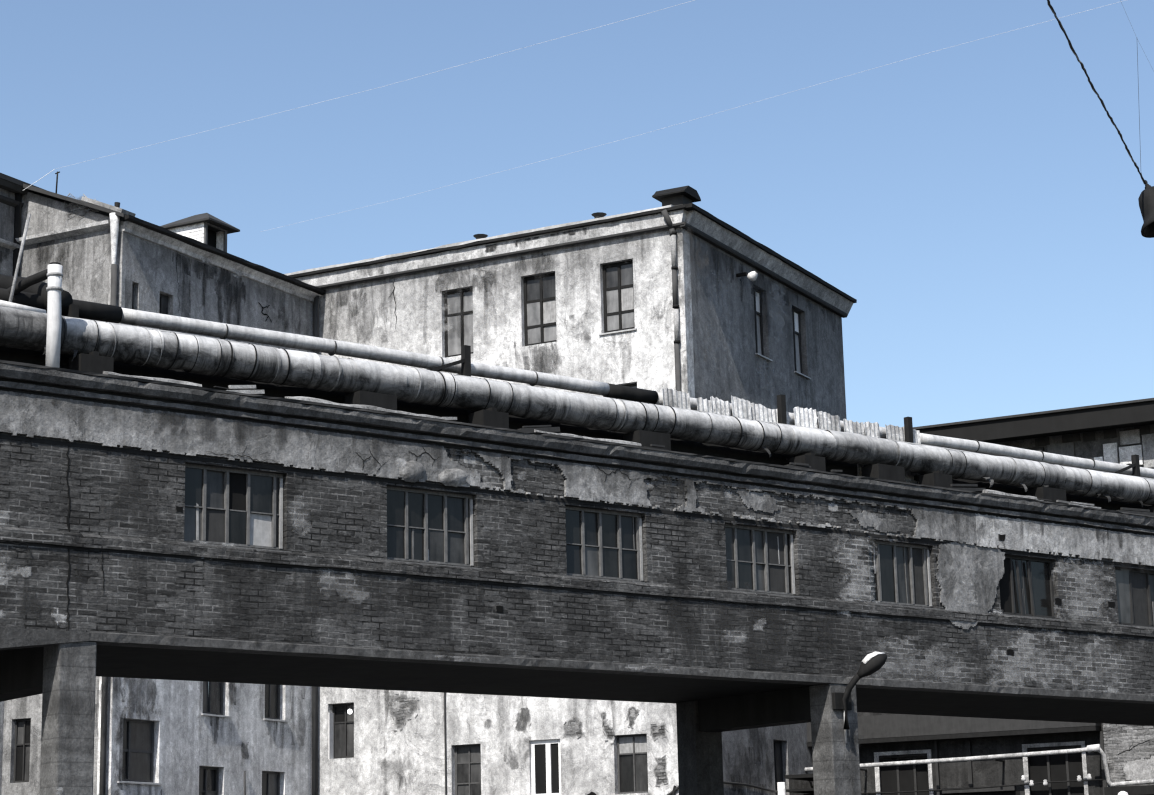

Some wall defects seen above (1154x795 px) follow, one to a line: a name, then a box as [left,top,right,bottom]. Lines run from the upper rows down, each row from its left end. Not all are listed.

leakage [172,257,249,325]
crack [357,446,441,474]
crack [0,445,109,629]
spalling [388,693,420,732]
spalling [600,712,615,745]
spalling [626,707,639,729]
spalling [650,723,667,741]
spalling [654,755,668,787]